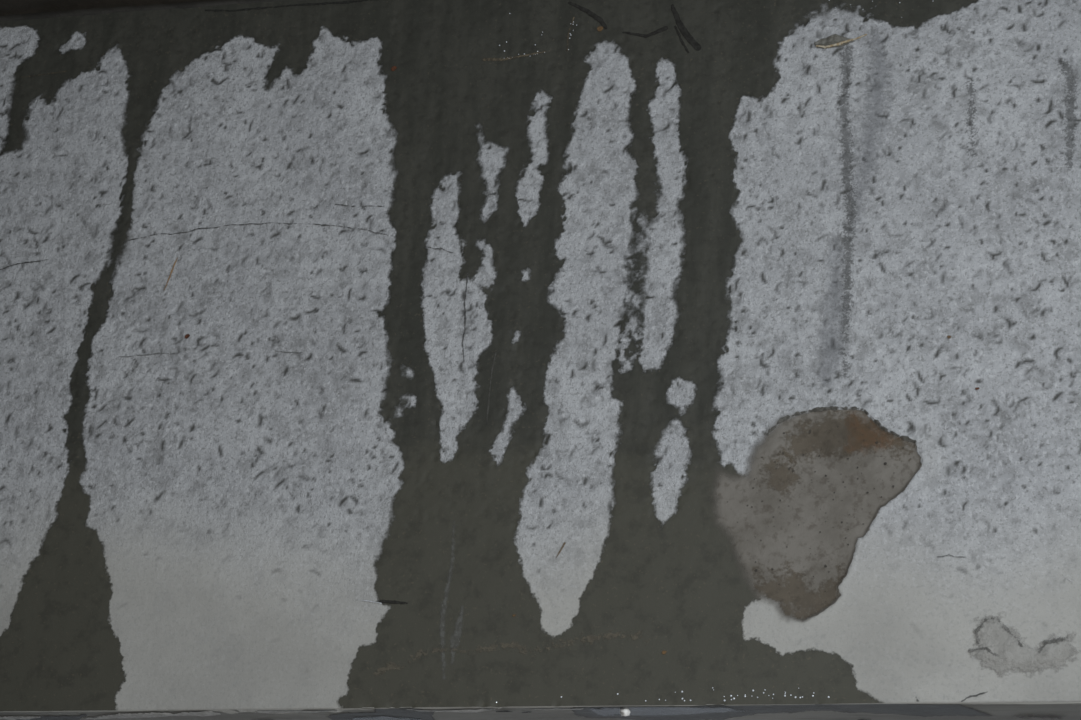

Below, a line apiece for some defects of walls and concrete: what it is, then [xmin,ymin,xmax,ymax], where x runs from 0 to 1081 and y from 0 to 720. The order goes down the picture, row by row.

leakage [0,0,217,16]
crack [205,0,366,12]
leakage [0,18,109,156]
leakage [1061,61,1077,168]
leakage [45,0,978,472]
leakage [0,54,170,711]
leakage [338,96,882,709]
leakage [328,708,434,720]
leakage [570,704,992,720]